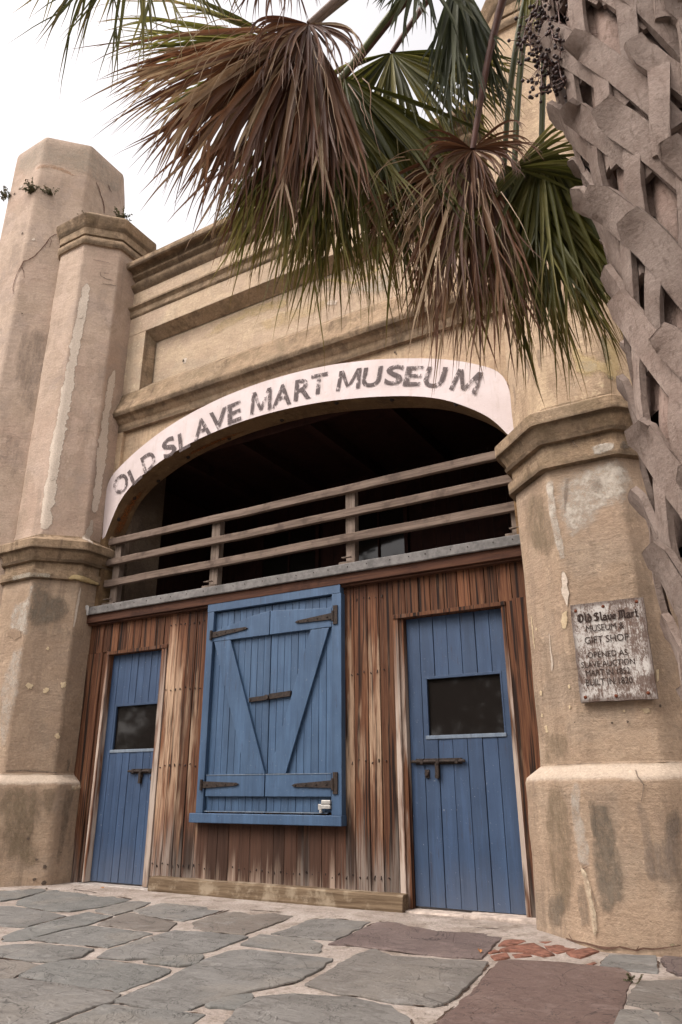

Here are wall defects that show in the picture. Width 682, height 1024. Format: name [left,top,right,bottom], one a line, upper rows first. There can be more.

crack [13,234,57,294]
peeling [40,283,90,529]
peeling [81,370,115,544]
peeling [546,483,564,557]
peeling [561,571,569,629]
leakage [547,792,570,925]
leakage [591,806,622,910]